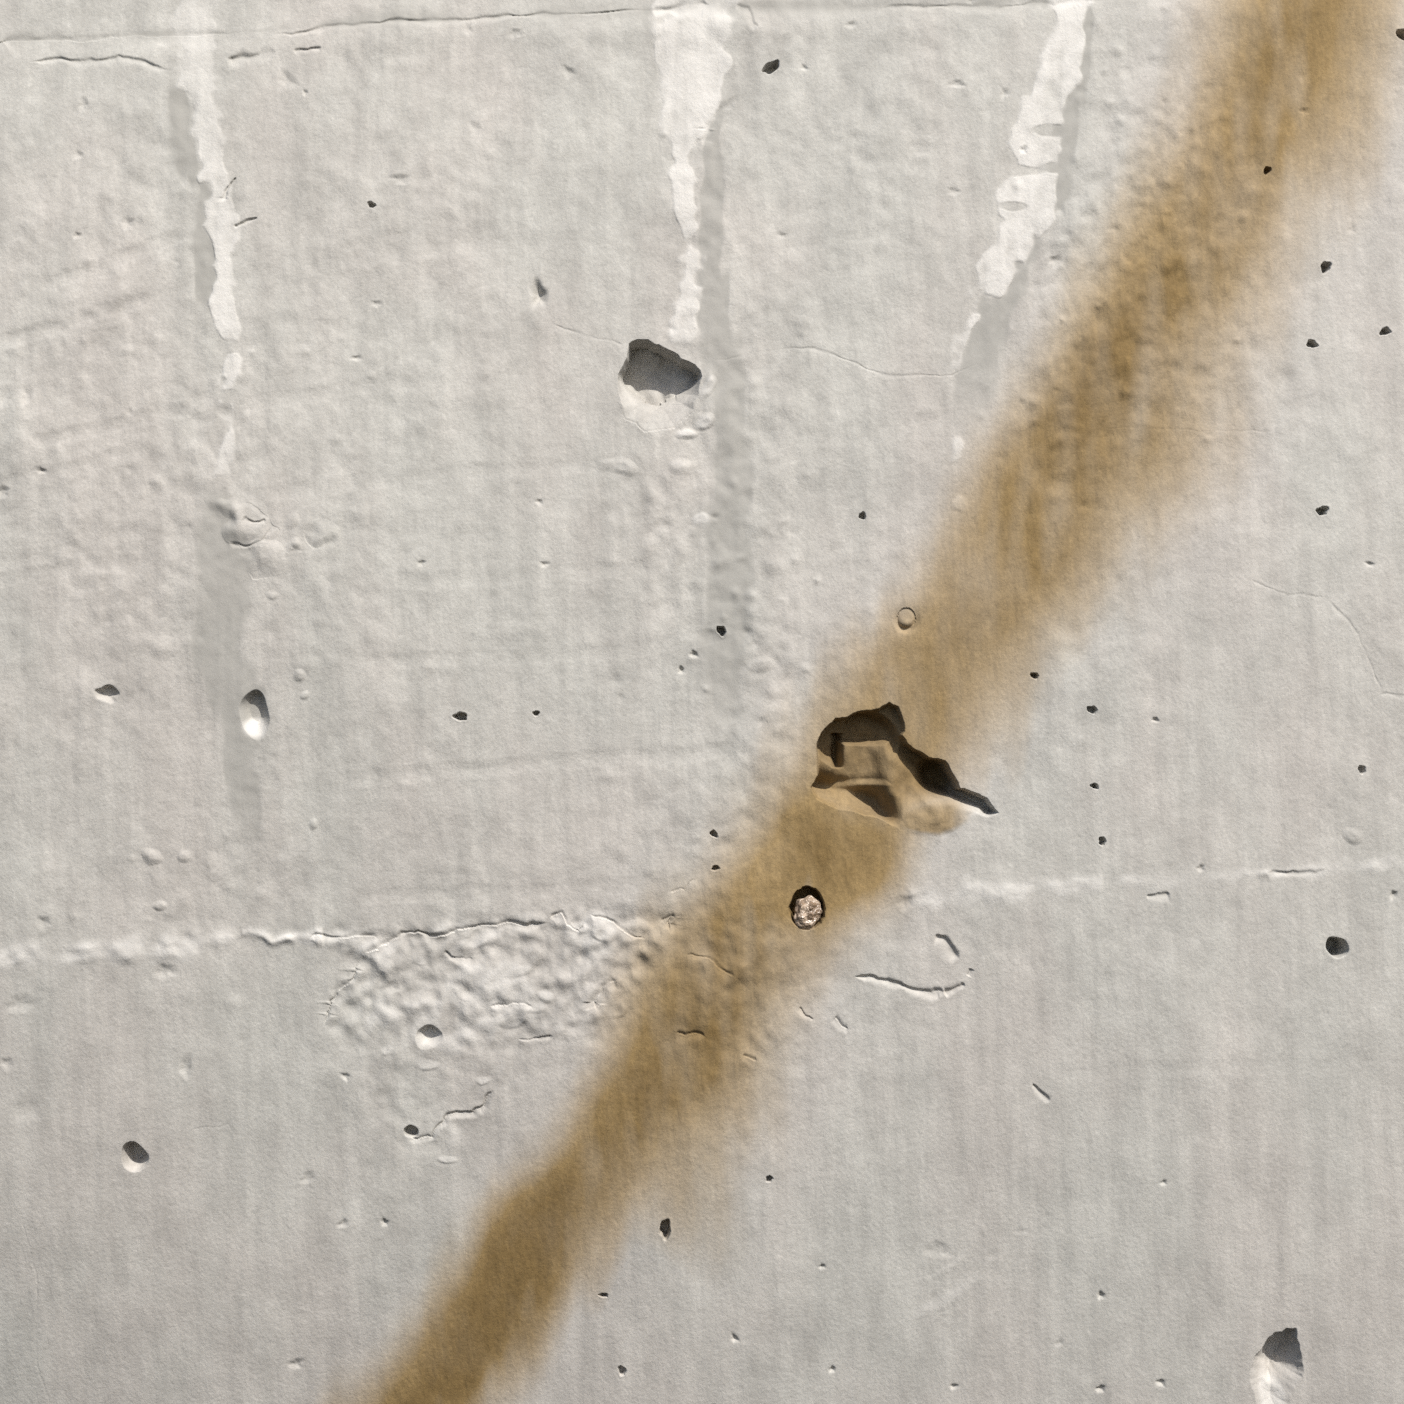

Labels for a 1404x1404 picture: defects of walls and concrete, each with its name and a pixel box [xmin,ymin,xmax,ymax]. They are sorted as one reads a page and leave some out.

water stain [174,0,218,28]
water stain [950,0,1097,432]
spalling [616,337,719,441]
water stain [650,0,758,758]
water stain [165,47,268,844]
spalling [595,457,646,480]
corrosion [313,0,1404,1404]
spalling [810,701,1001,839]
crack [853,933,975,1000]
crack [797,1006,849,1034]
spalling [1247,1326,1307,1404]